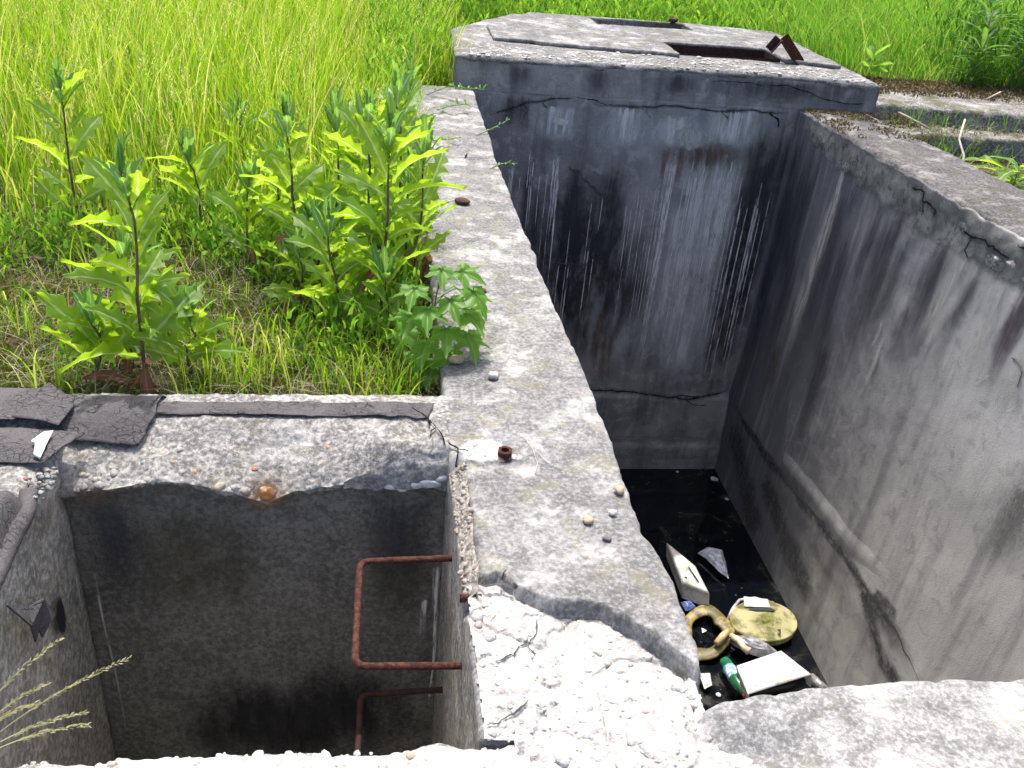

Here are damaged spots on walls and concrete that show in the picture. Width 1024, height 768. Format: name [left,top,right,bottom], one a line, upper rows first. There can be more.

crack [497,80,861,128]
damp [504,106,815,372]
damp [796,173,845,332]
damp [859,213,903,308]
crack [912,187,937,219]
damp [900,249,976,346]
crack [960,229,1024,259]
damp [976,277,1024,359]
crack [590,389,728,406]
damp [730,412,898,683]
spalling [19,438,761,768]
damp [228,683,377,748]